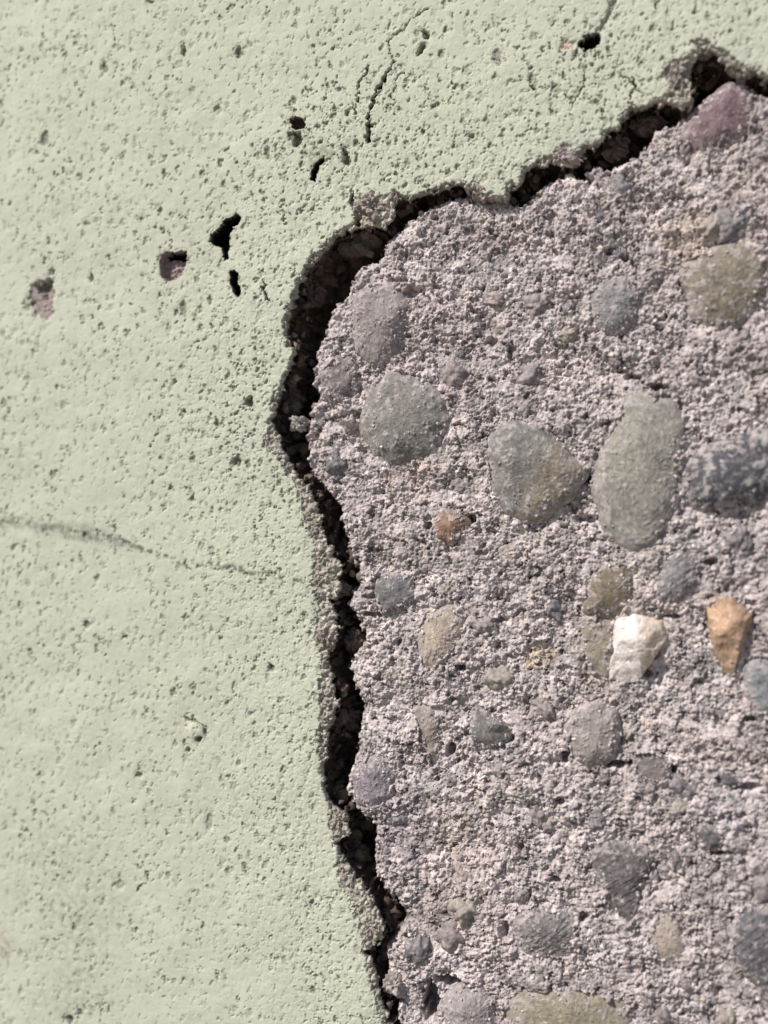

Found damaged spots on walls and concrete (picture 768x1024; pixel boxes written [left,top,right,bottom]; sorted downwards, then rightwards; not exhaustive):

crack [353,5,433,143]
hole [413,26,434,58]
spalling [25,264,59,323]
spalling [243,38,768,1024]
crack [261,48,768,1024]